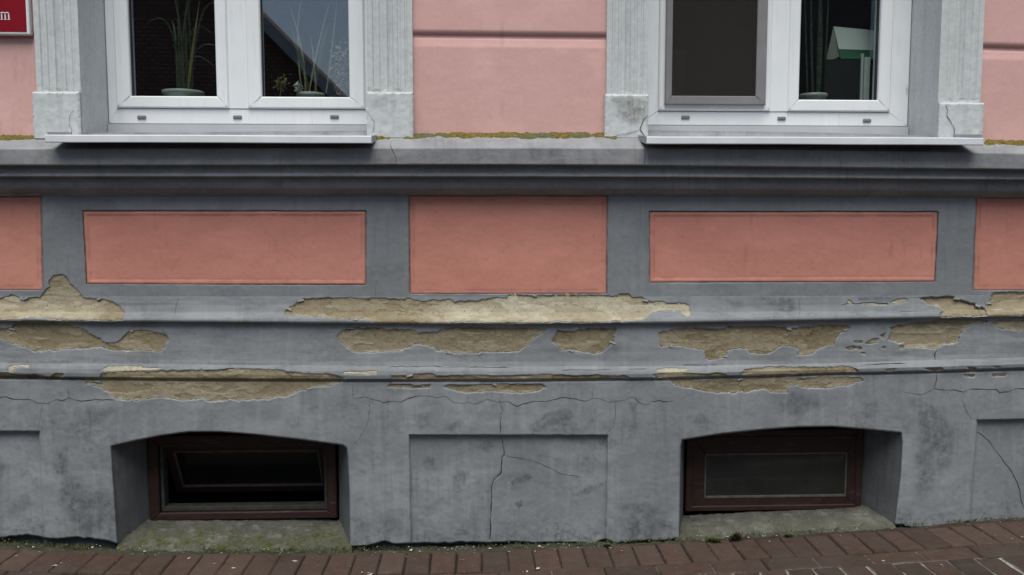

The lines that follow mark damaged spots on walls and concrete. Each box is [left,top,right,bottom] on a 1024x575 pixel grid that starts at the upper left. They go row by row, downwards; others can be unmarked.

peeling [0,275,168,352]
peeling [0,365,377,402]
crack [352,366,674,536]
peeling [285,292,1024,393]
crack [902,351,1024,507]